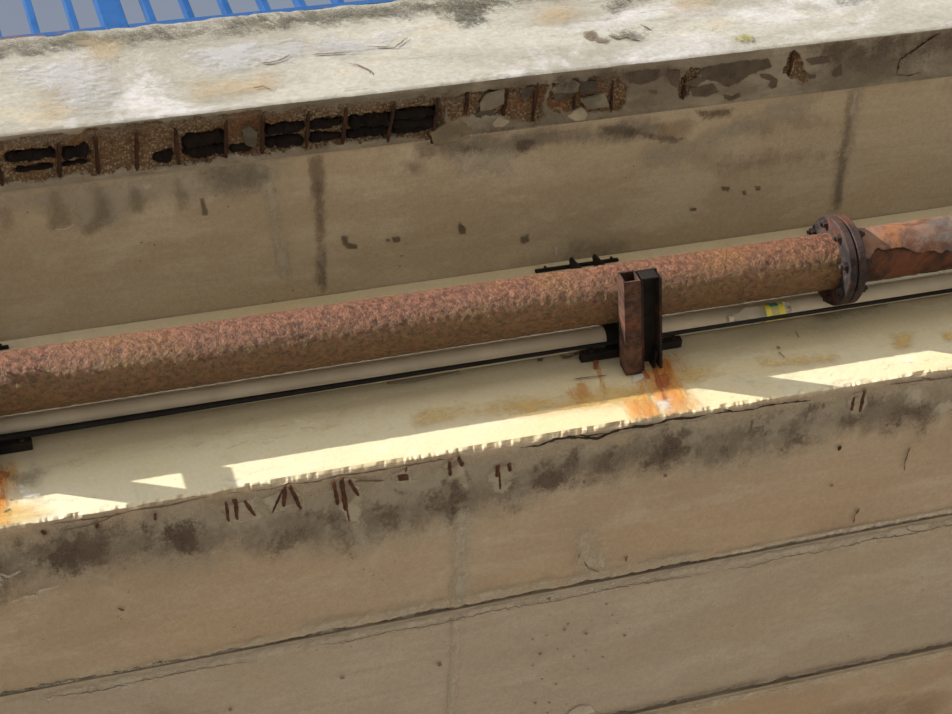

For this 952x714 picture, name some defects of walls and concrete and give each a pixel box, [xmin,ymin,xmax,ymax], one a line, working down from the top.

spalling [584,30,607,42]
crack [897,33,941,76]
spalling [0,50,843,186]
rust [497,359,690,420]
rust [0,465,35,526]
damp [0,375,952,714]